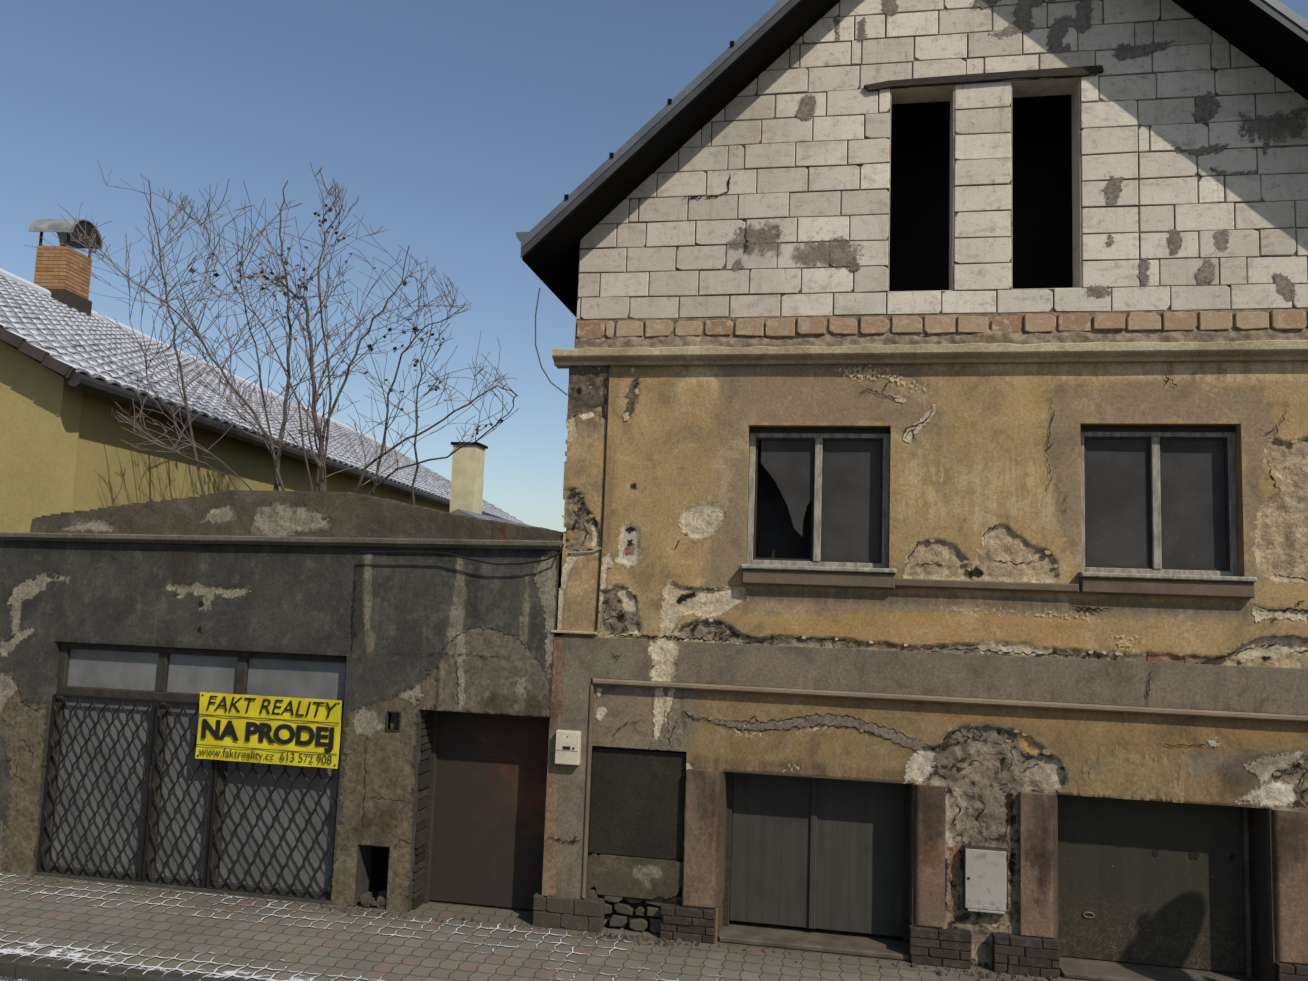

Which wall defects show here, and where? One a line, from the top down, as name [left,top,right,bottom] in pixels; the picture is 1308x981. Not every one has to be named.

spalling [201,505,234,525]
spalling [253,502,329,537]
spalling [1252,435,1308,585]
peeling [0,571,70,875]
peeling [166,581,252,632]
damp [363,553,376,653]
damp [447,558,467,712]
damp [513,675,529,712]
damp [519,575,530,642]
crack [613,711,939,765]
spalling [533,487,1308,850]
spalling [903,724,1071,967]